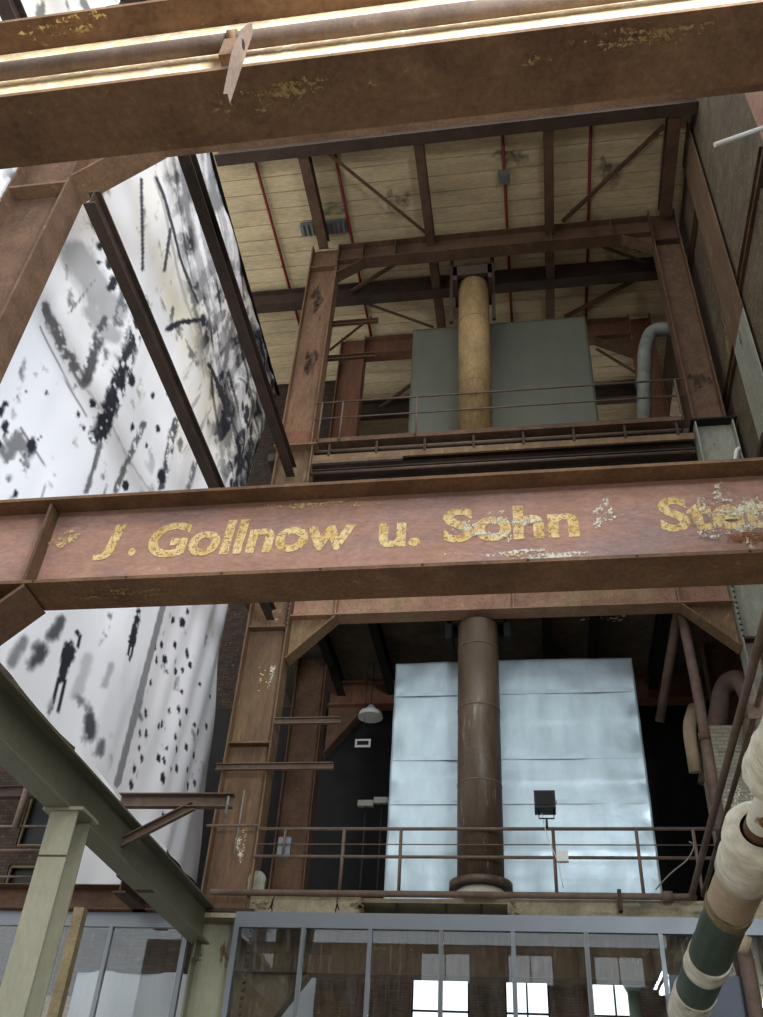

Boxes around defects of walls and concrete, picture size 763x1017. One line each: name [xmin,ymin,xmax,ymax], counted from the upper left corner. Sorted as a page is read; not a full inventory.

peeling [695,481,763,548]